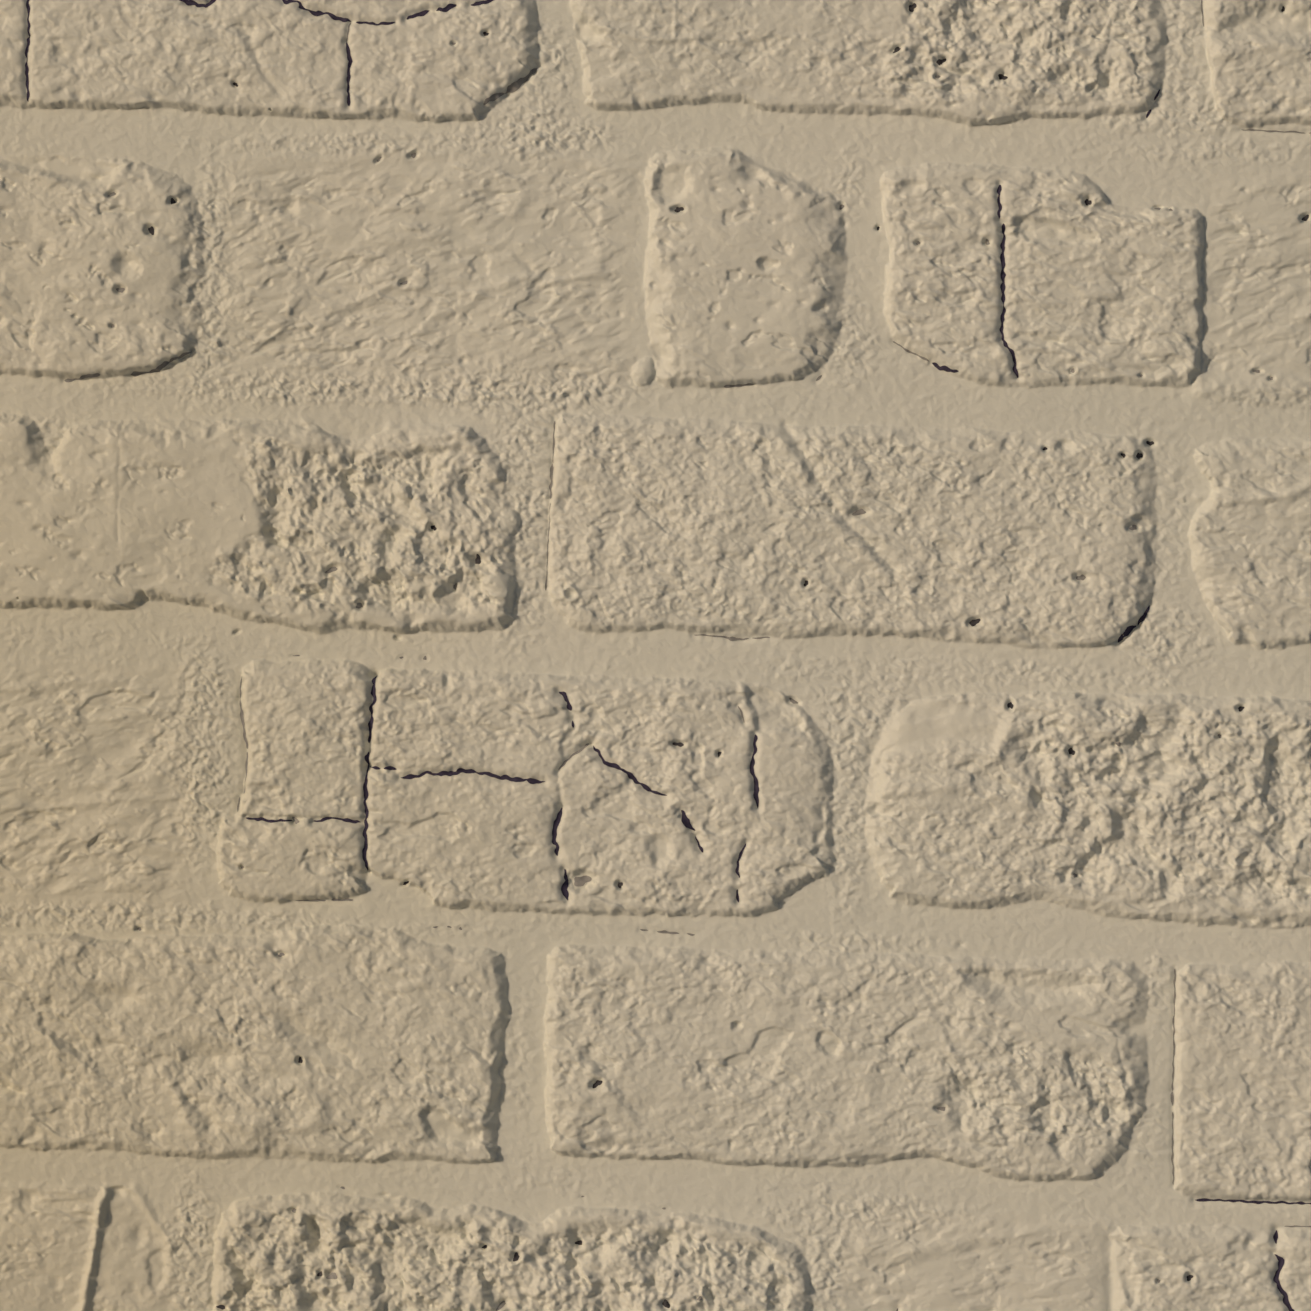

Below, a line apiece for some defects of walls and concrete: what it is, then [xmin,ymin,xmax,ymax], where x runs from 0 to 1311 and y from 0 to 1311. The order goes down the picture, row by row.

crack [23,0,31,101]
crack [180,0,216,8]
crack [282,0,493,106]
crack [484,68,538,105]
crack [997,185,1018,378]
crack [246,676,703,871]
crack [738,706,759,808]
crack [552,808,569,900]
crack [735,844,746,902]
crack [1273,1230,1294,1311]